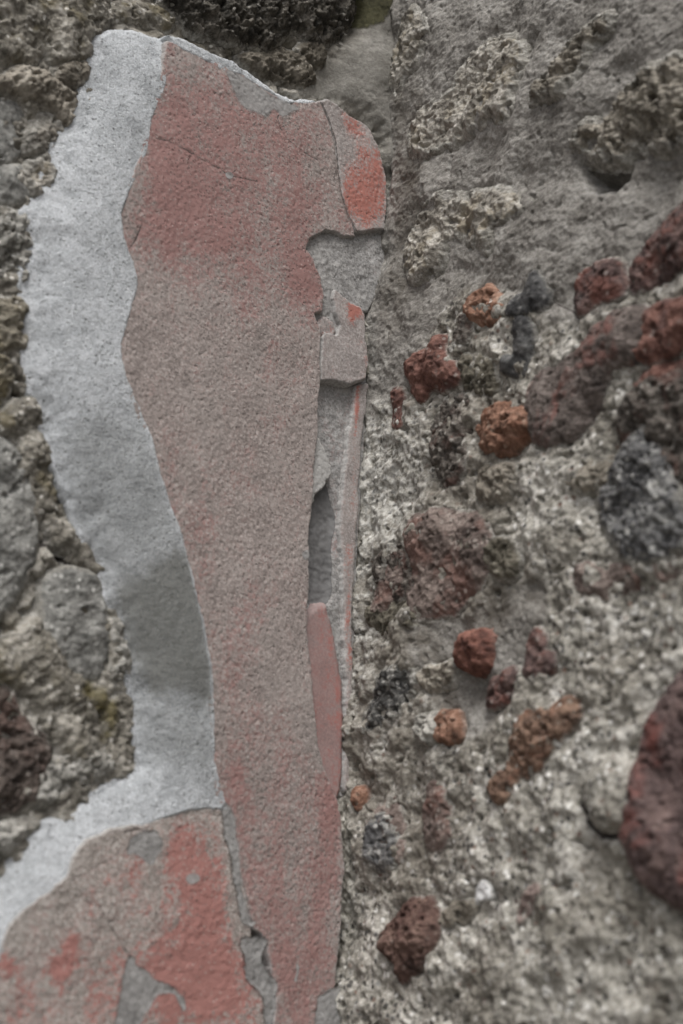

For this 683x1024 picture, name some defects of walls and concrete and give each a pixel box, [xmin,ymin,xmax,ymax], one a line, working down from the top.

crack [277,103,358,233]
spalling [306,233,385,336]
spalling [306,379,368,799]
crack [222,803,256,926]
spalling [115,957,186,1024]